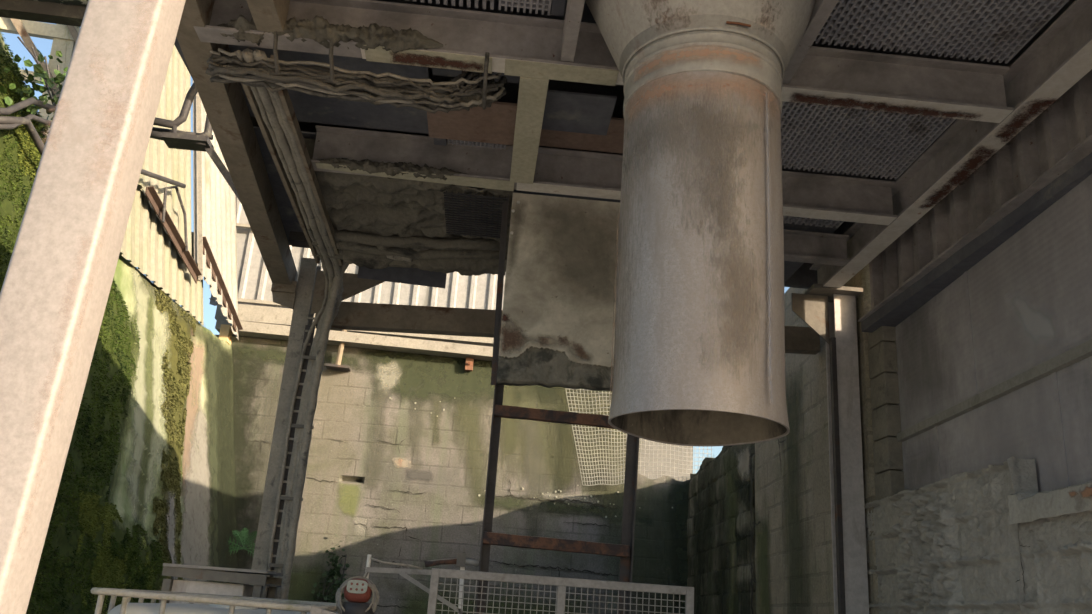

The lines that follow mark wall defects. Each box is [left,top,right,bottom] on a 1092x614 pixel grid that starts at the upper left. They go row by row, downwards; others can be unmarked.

corrosion [791,93,980,120]
corrosion [920,100,1056,208]
leakage [110,268,211,566]
leakage [367,365,397,486]
leakage [693,483,751,614]